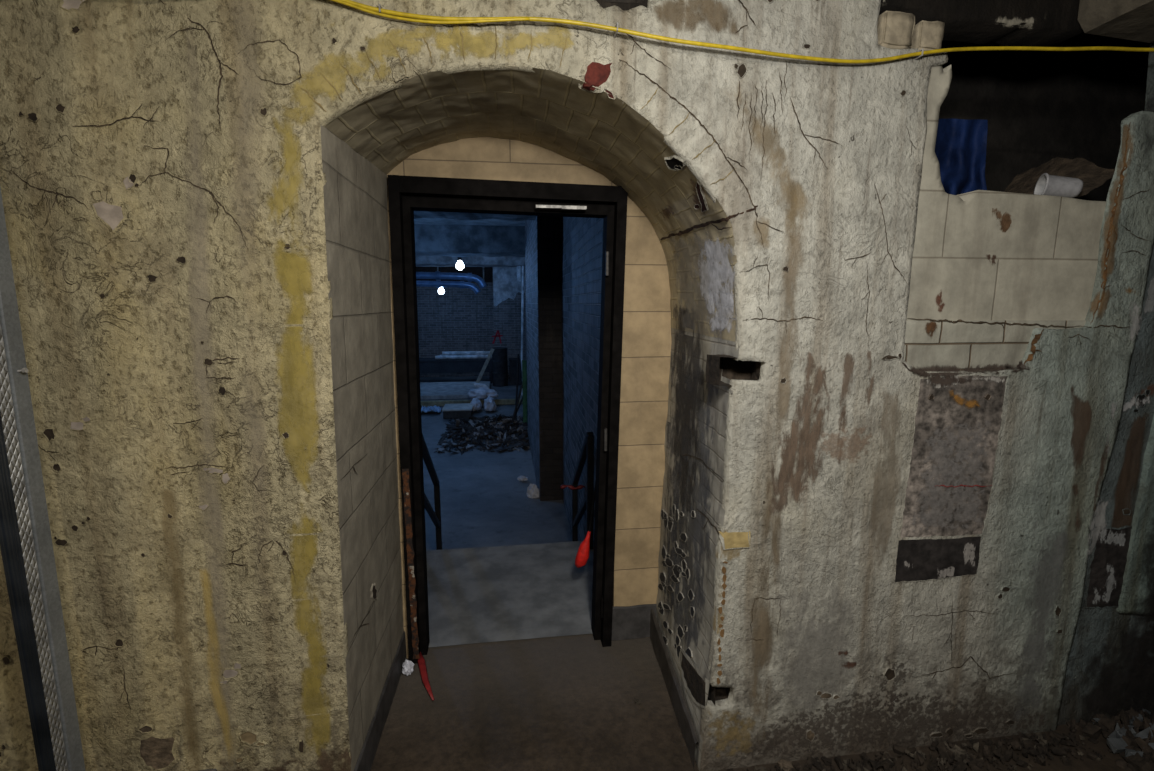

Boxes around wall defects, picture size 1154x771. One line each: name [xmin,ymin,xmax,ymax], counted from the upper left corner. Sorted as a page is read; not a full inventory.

crack [160,0,302,132]
crack [619,34,820,334]
spalling [877,11,1150,201]
corrosion [1091,126,1133,312]
damp [275,241,318,485]
damp [767,233,854,563]
peeling [897,372,1009,540]
damp [291,518,352,771]
peeling [657,504,696,659]
damp [751,603,772,714]